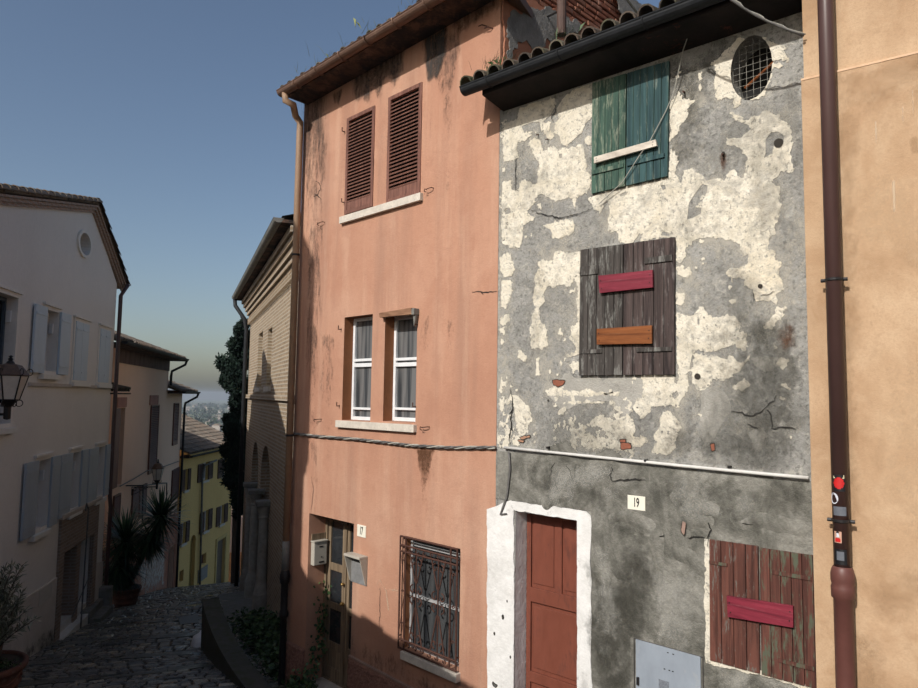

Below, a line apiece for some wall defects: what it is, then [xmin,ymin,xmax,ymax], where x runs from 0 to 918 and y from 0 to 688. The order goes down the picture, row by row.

damp [424,0,495,80]
damp [304,89,342,185]
peeling [499,37,794,345]
peeling [517,250,750,459]
peeling [774,345,789,370]
peeling [497,377,536,448]
crack [731,395,795,430]